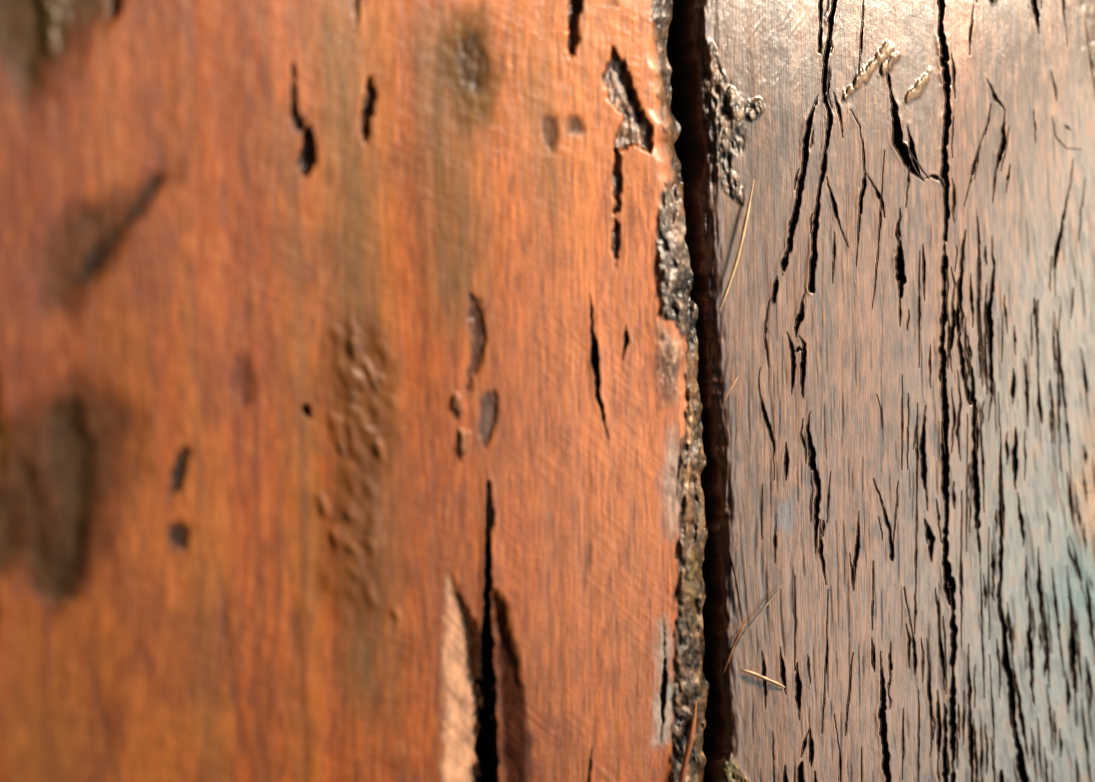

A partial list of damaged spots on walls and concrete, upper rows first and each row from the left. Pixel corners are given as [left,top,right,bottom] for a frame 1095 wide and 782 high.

leakage [0,387,127,604]
crack [452,483,499,782]
crack [590,295,629,440]
crack [758,0,1095,782]